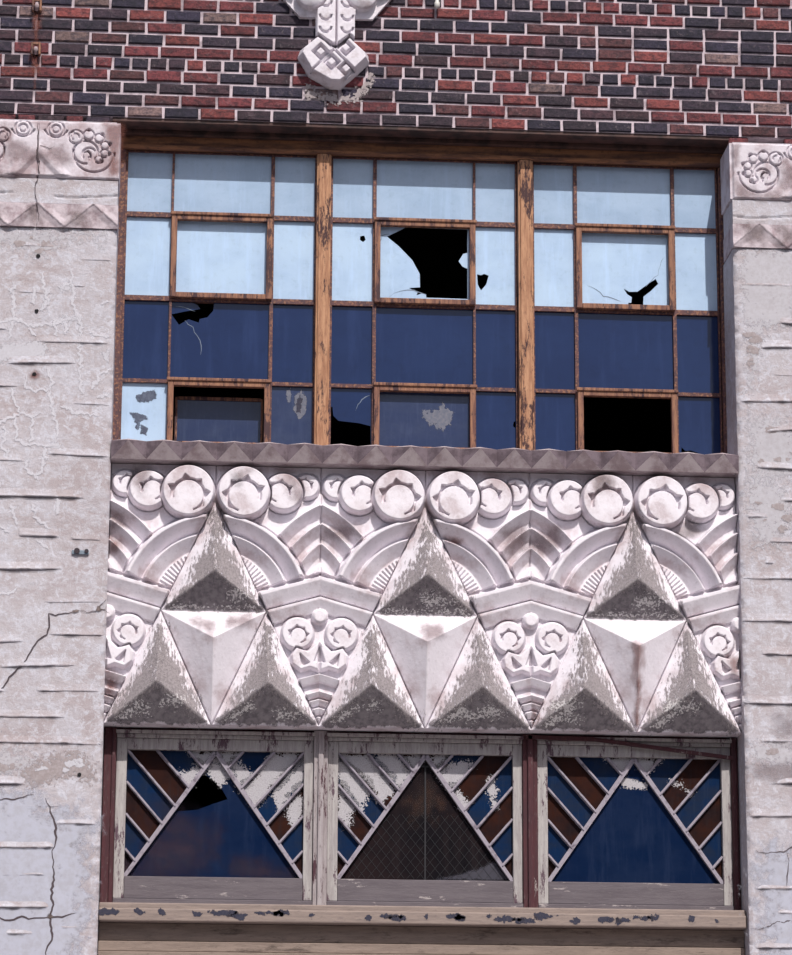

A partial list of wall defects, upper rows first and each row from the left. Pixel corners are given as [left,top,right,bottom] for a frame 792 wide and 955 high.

crack [35,125,50,220]
peeling [106,503,739,736]
crack [2,600,108,689]
crack [0,794,74,955]
crack [756,847,792,886]
peeling [192,909,290,921]
peeling [364,913,406,921]
peeling [486,912,558,924]
peeling [598,913,659,925]